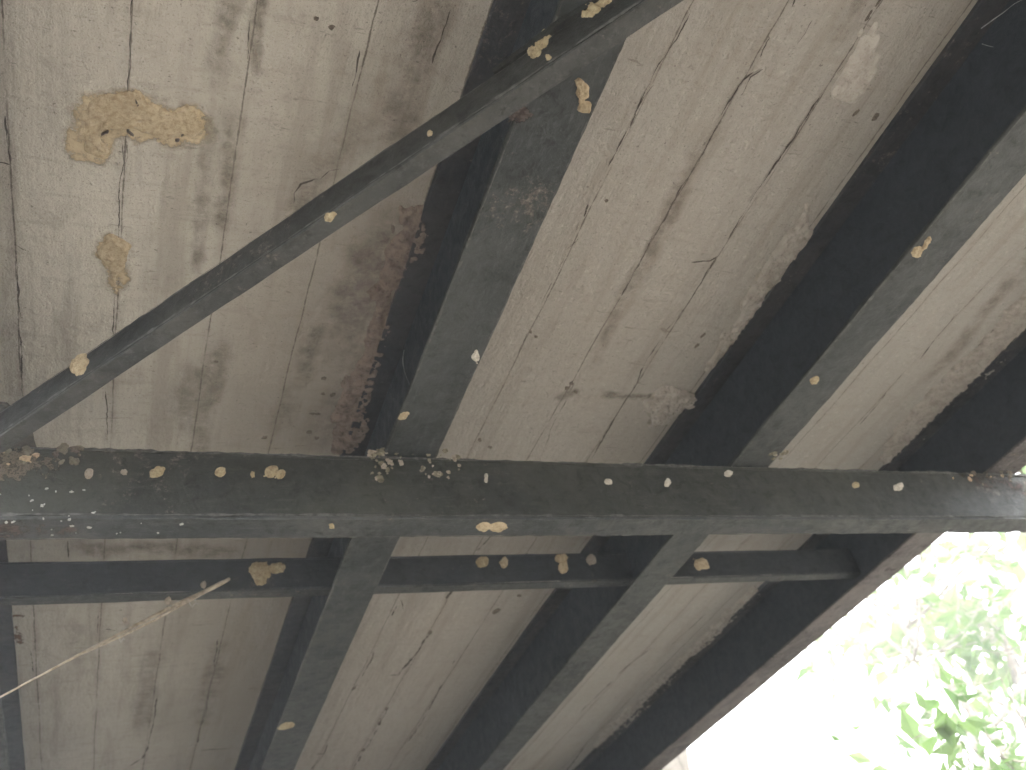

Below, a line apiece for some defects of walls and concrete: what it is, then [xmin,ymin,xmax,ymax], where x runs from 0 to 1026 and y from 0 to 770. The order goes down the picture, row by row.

crack [126,0,134,92]
crack [0,116,11,165]
crack [118,137,128,238]
crack [543,14,690,300]
crack [594,38,843,454]
crack [15,244,29,396]
corrosion [0,447,67,491]
crack [399,633,431,674]